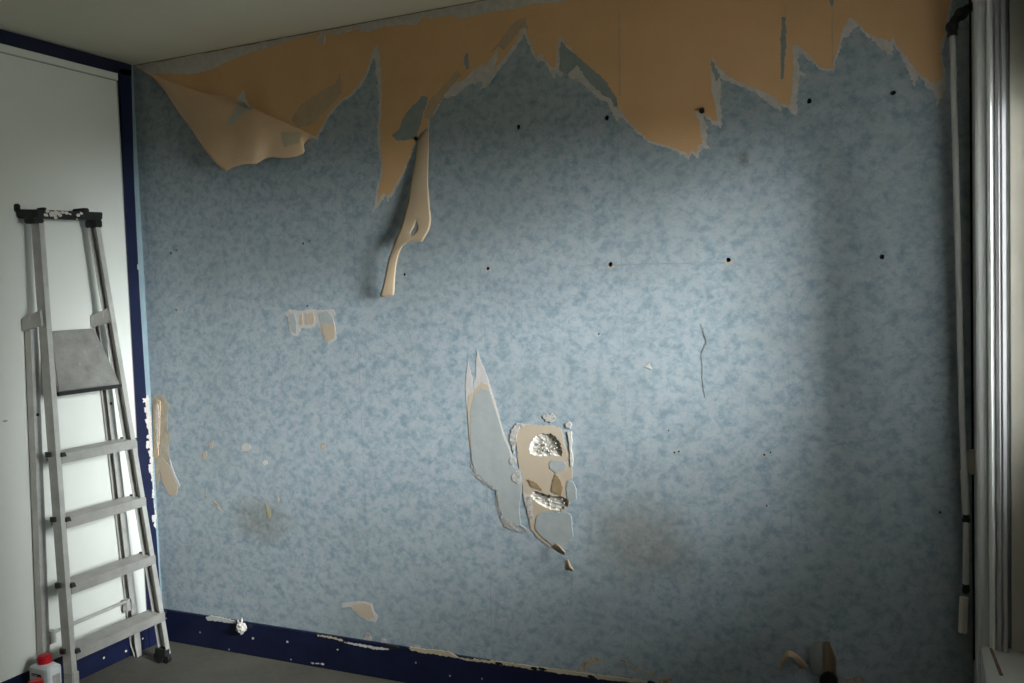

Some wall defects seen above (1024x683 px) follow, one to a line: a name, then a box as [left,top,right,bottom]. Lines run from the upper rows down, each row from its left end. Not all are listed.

peeling [284,309,337,344]
crack [699,324,707,395]
peeling [465,350,577,548]
flaking render [206,615,236,624]
flaking render [317,601,672,683]